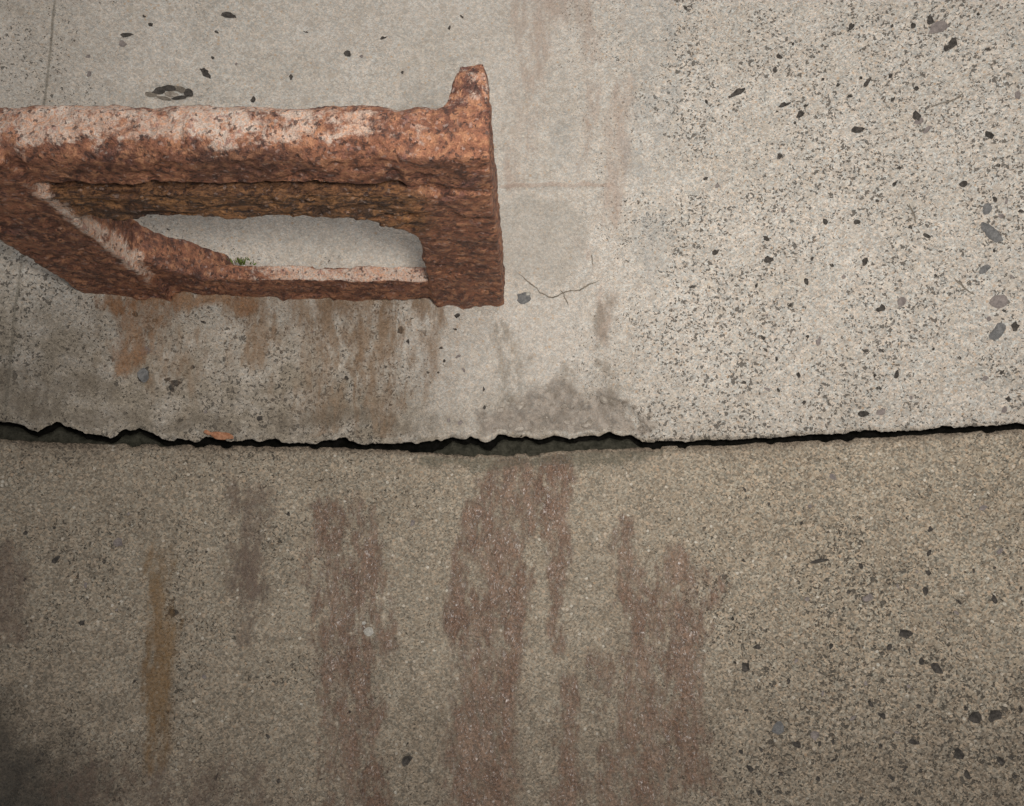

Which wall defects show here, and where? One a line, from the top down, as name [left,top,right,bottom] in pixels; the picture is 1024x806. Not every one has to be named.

crack [0,422,1024,457]